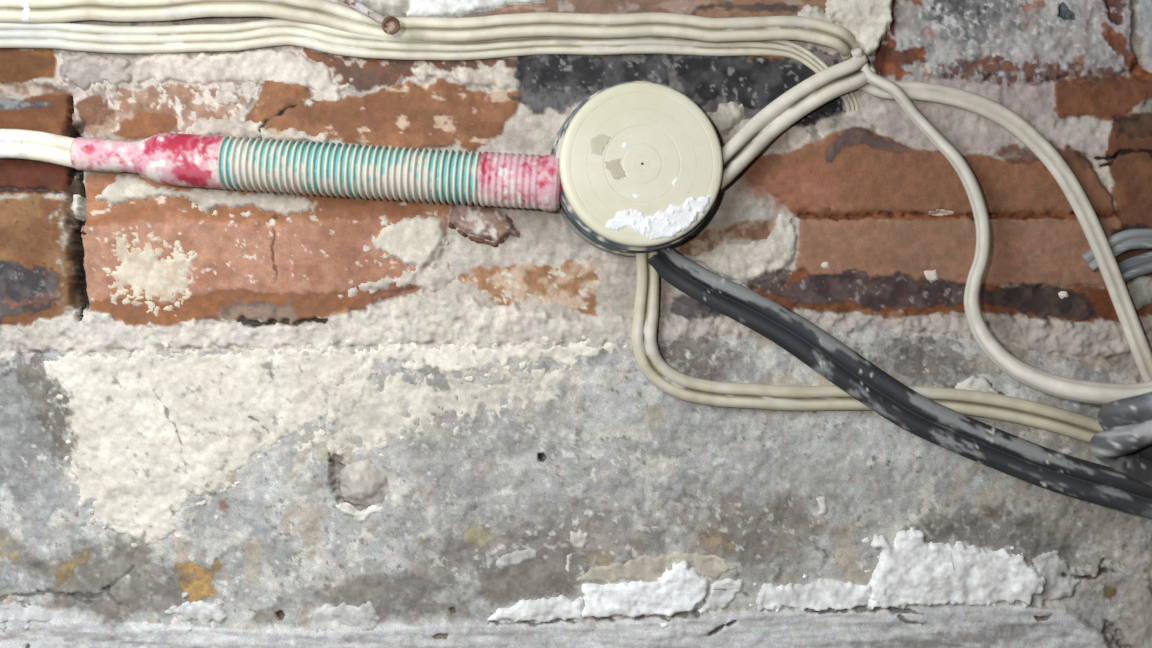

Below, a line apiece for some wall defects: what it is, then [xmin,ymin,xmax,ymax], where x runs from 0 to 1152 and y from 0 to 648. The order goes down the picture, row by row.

peeling [215,81,260,106]
flaking render [76,96,113,124]
peeling [434,201,520,248]
peeling [146,232,196,256]
flaking render [373,284,420,301]
crack [0,565,134,607]
damp [479,546,582,604]